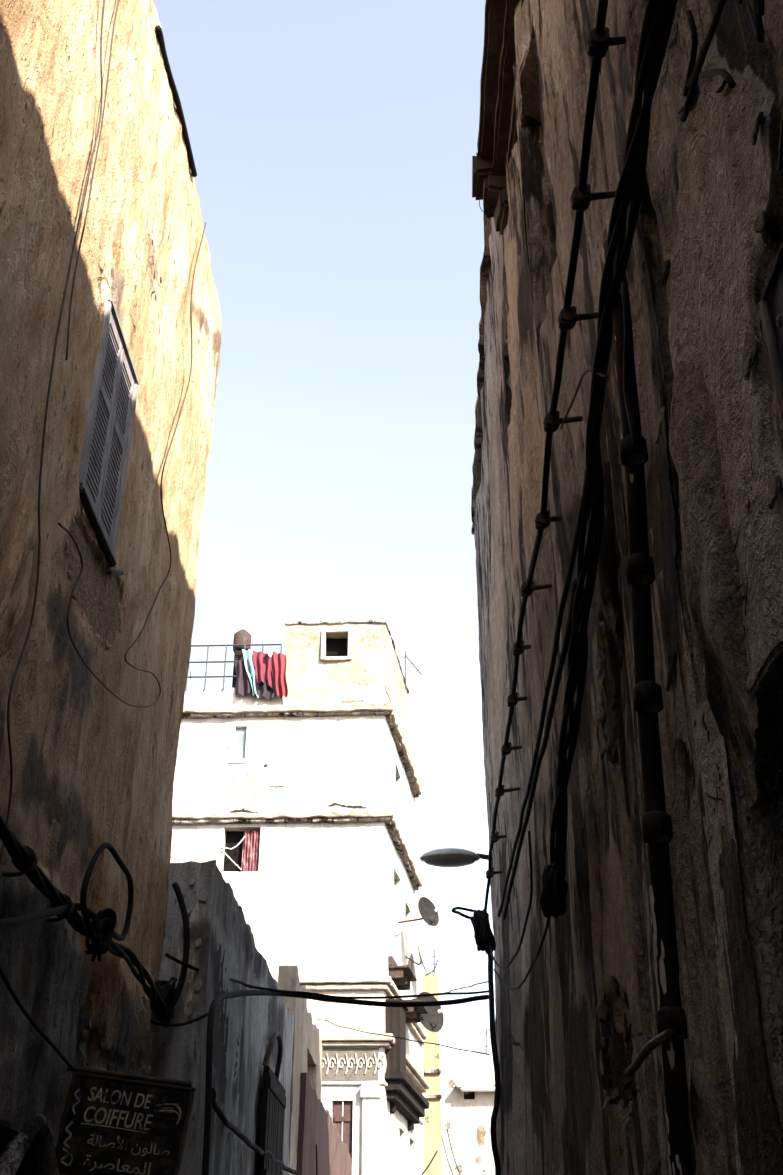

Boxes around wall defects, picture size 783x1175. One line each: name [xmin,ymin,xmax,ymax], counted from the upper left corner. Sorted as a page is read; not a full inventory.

damp [537,0,645,333]